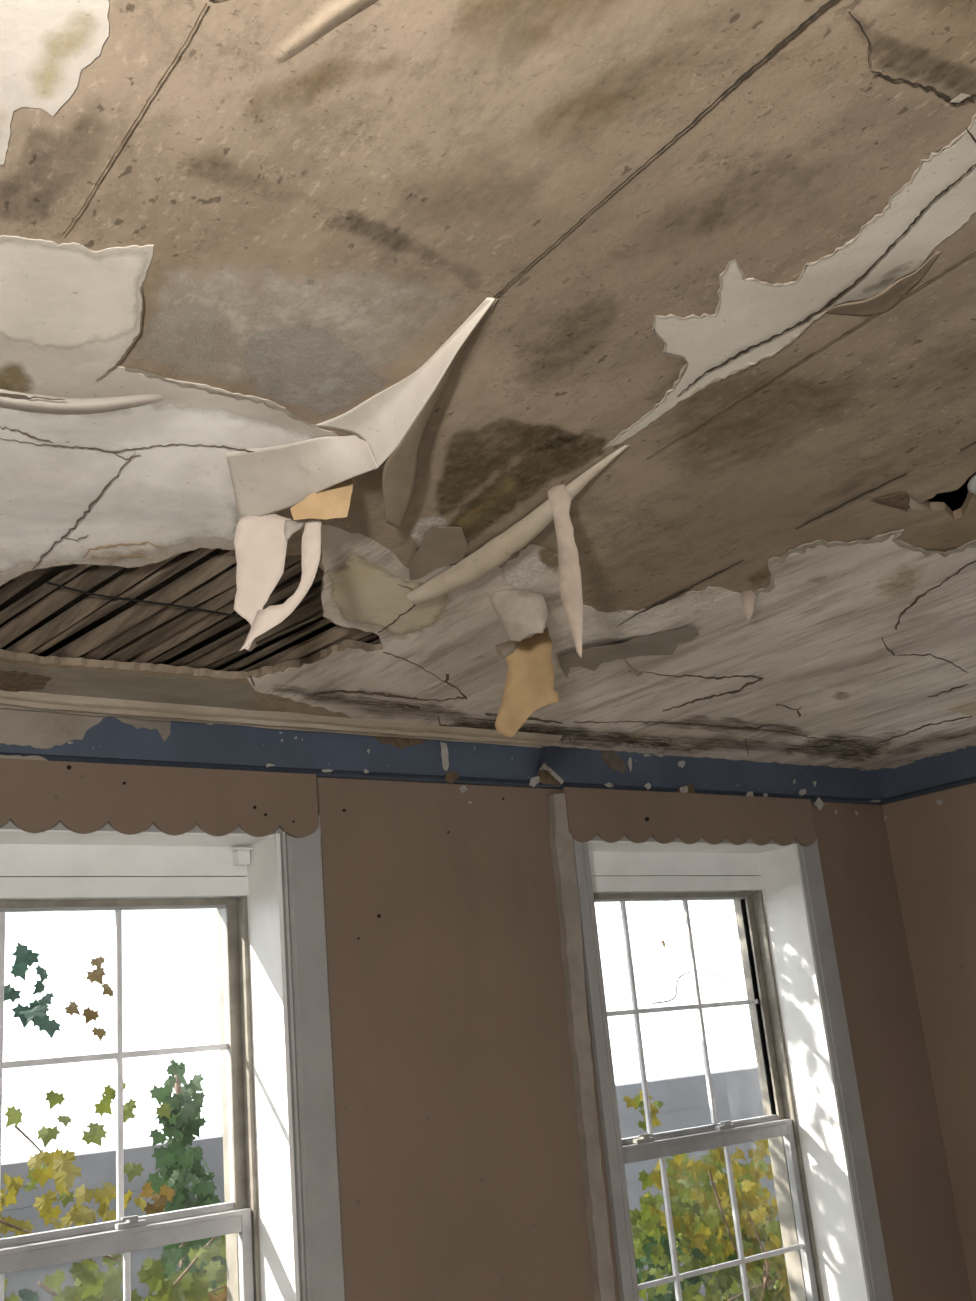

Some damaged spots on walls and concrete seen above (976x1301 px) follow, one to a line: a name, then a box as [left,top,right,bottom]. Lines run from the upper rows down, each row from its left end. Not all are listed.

flaking render [0,0,109,165]
leakage [0,366,29,393]
crack [96,286,144,381]
crack [494,0,976,458]
peeling [602,113,976,449]
crack [0,392,254,570]
flaking render [0,235,976,814]
leakage [438,422,605,542]
leakage [279,689,496,729]
crack [314,559,976,756]
leakage [518,717,976,761]